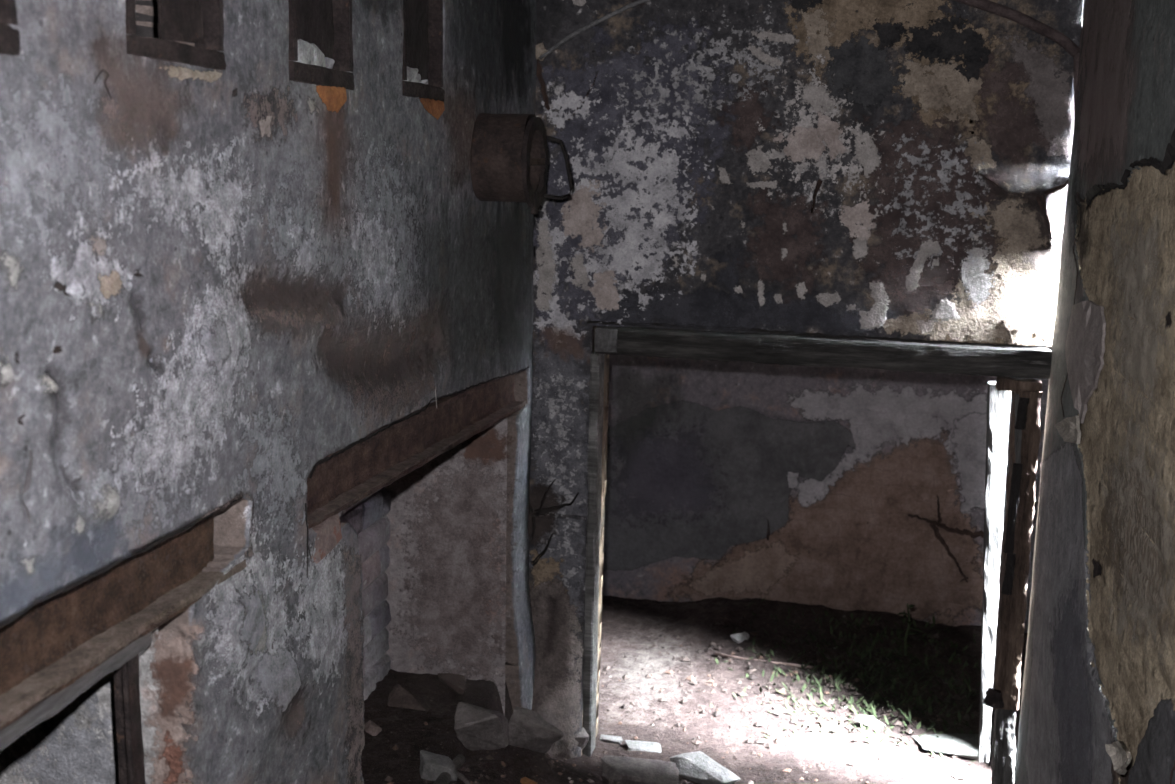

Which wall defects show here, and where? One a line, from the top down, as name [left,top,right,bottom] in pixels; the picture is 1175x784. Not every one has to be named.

flaking render [419,98,445,120]
water stain [0,36,532,718]
peeling [529,0,1175,784]
crack [908,496,984,582]
flaking render [144,620,205,784]